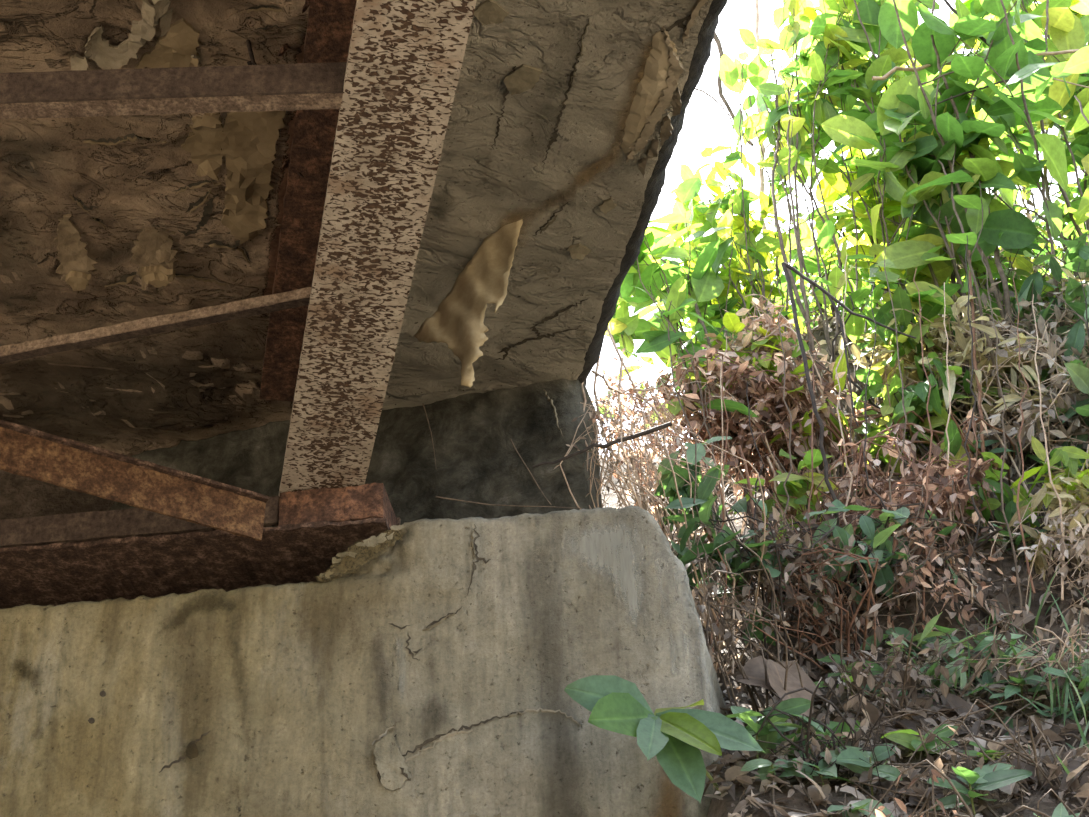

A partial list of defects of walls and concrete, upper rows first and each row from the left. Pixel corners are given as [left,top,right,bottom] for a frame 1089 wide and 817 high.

flaking render [70,0,200,71]
crack [492,66,516,149]
crack [542,19,590,170]
corrosion [262,110,297,296]
crack [495,299,587,360]
spalling [315,525,407,582]
crack [390,524,491,660]
crack [402,708,581,763]